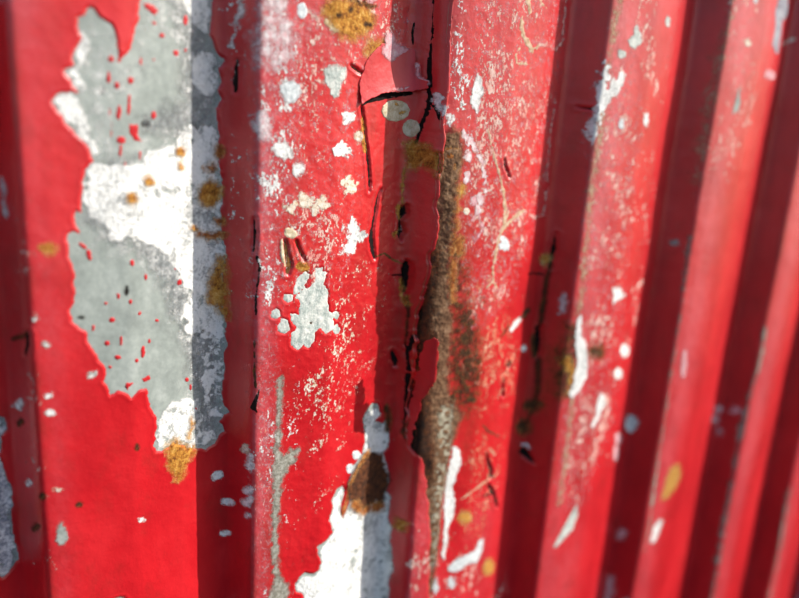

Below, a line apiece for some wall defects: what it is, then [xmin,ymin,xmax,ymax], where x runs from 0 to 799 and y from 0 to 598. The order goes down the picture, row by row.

corrosion [322,0,386,56]
crack [411,0,454,143]
peeling [52,0,243,451]
crack [360,108,402,264]
peeling [226,0,557,507]
crack [528,234,557,326]
peeling [554,0,670,551]
crack [390,298,417,440]
corrosion [393,126,486,596]
corrosion [550,325,577,398]
peeling [295,403,406,598]
corrosion [342,450,392,515]